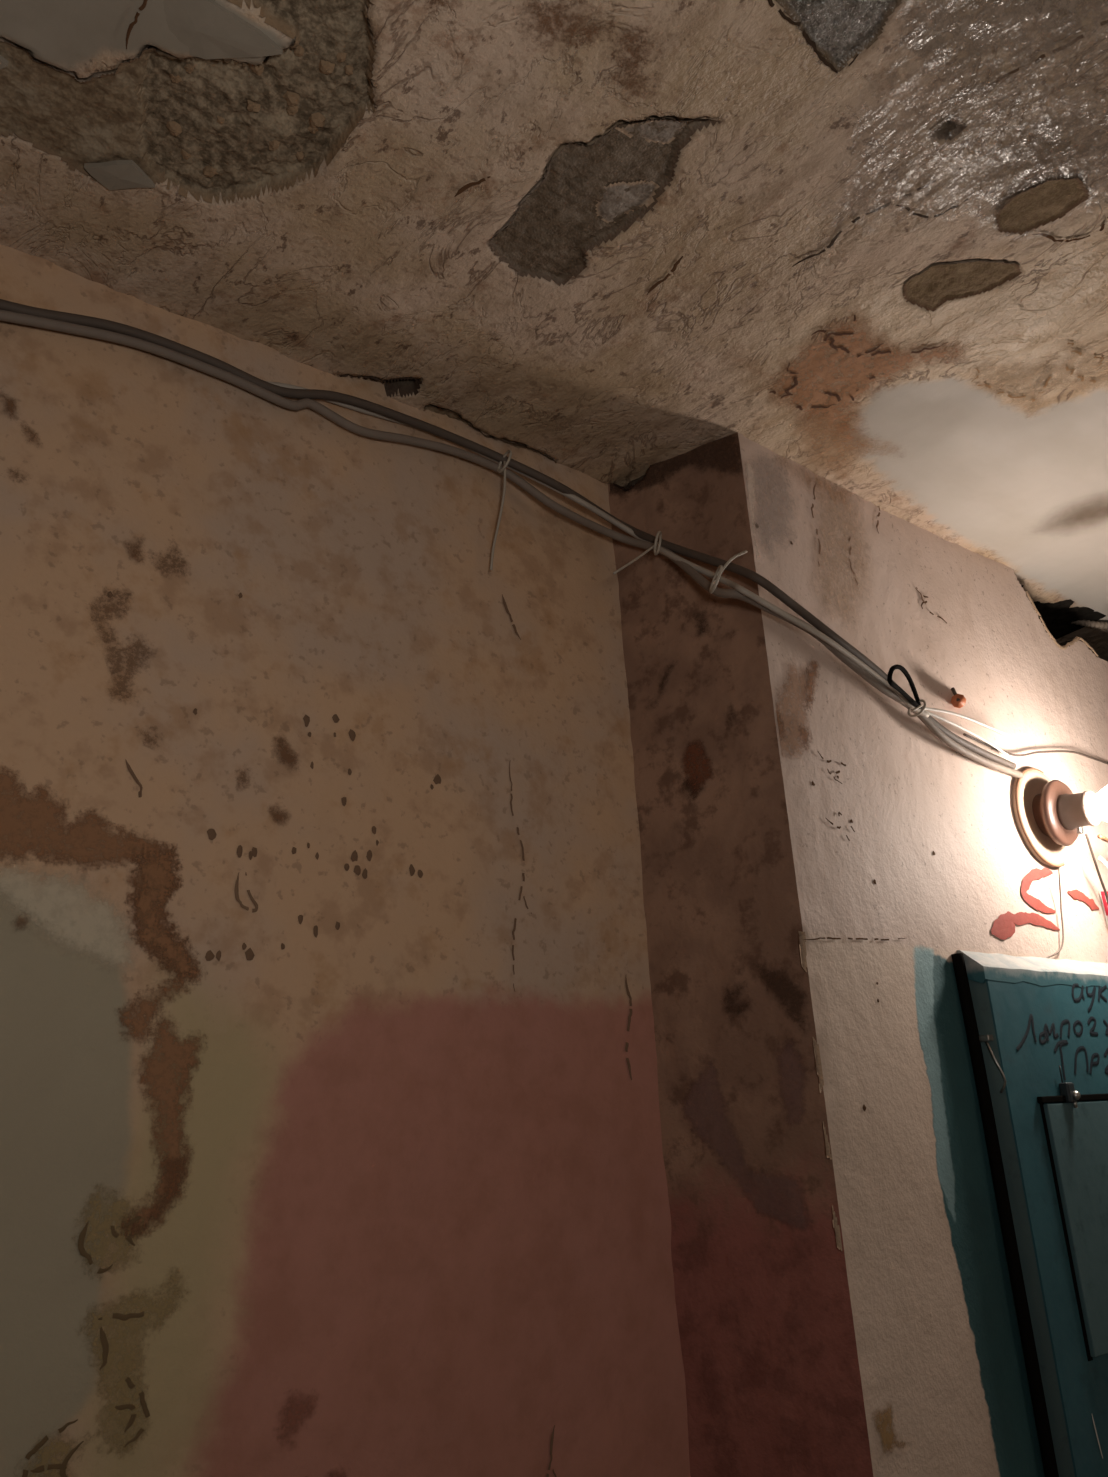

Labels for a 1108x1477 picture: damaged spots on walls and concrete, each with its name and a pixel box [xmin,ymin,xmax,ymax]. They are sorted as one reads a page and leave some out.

flaking render [768,0,902,73]
flaking render [0,0,377,204]
water stain [838,0,1108,226]
flaking render [490,118,722,286]
flaking render [996,178,1090,235]
flaking render [903,261,1022,312]
peeling [22,1419,84,1477]